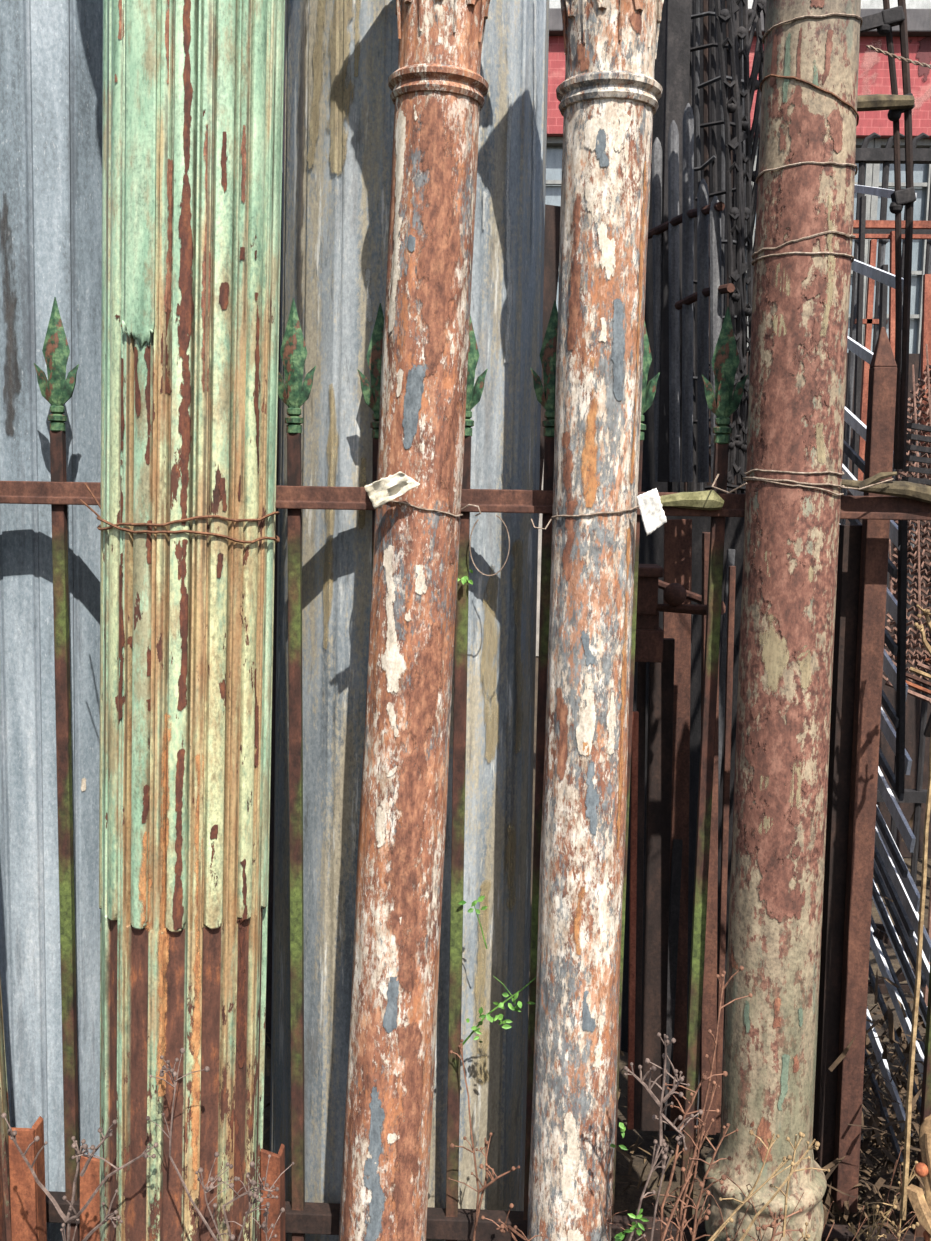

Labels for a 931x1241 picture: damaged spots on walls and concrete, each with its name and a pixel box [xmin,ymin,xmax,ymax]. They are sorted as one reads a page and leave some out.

peeling [582,112,633,167]
corrosion [822,29,834,83]
corrosion [410,96,462,377]
peeling [585,180,616,279]
peeling [134,308,172,465]
corrosion [440,389,460,563]
corrosion [383,622,444,993]
peeling [576,630,616,836]
corrosion [235,859,248,1068]
peeling [582,990,605,1069]
corrosion [391,1022,424,1241]
peeling [561,1112,580,1202]